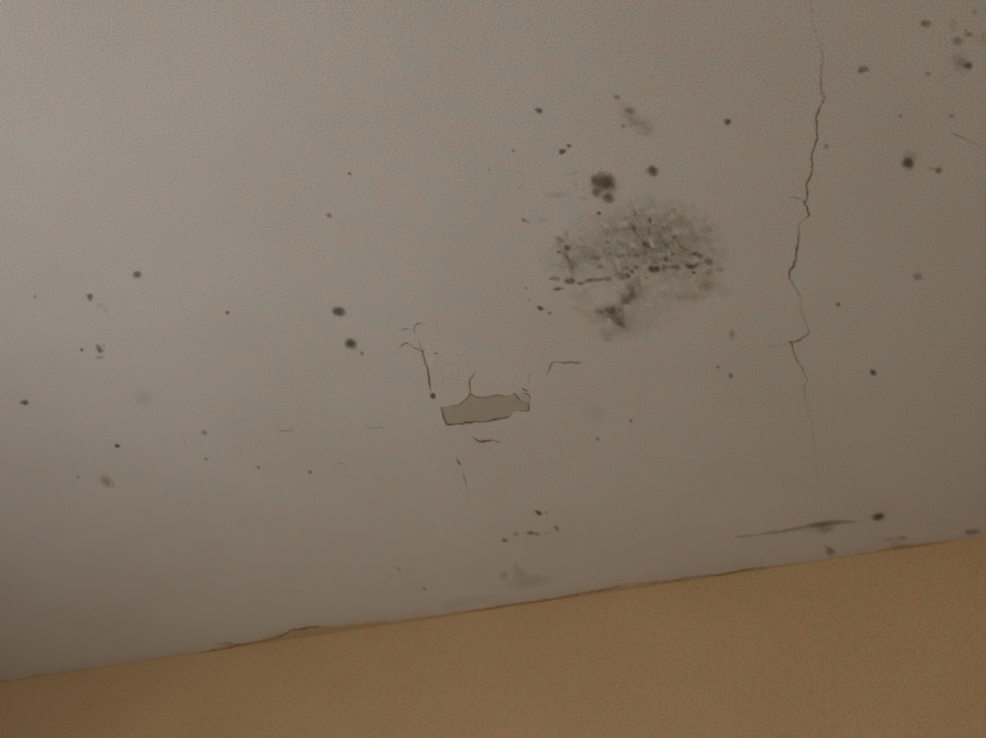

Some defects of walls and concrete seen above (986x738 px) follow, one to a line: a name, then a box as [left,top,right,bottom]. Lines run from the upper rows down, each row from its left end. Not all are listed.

damp [536,163,737,344]
peeling [440,380,530,425]